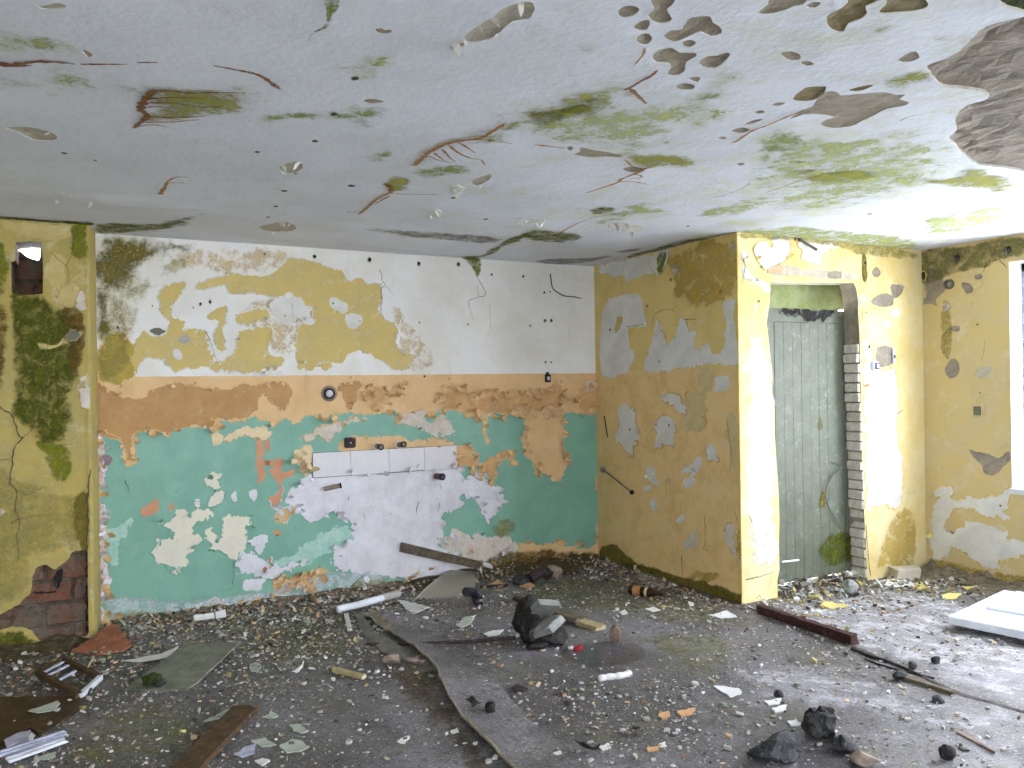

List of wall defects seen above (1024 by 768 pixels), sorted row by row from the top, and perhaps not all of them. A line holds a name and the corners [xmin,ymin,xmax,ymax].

spalling [827,0,928,32]
spalling [618,0,730,90]
rust [133,90,238,128]
rust [215,66,280,89]
spalling [717,85,909,139]
spalling [898,0,1024,171]
rust [414,124,512,166]
rust [359,184,435,214]
rust [586,160,652,193]
peeling [0,249,779,645]
crack [0,403,91,563]
peeling [925,485,1024,570]